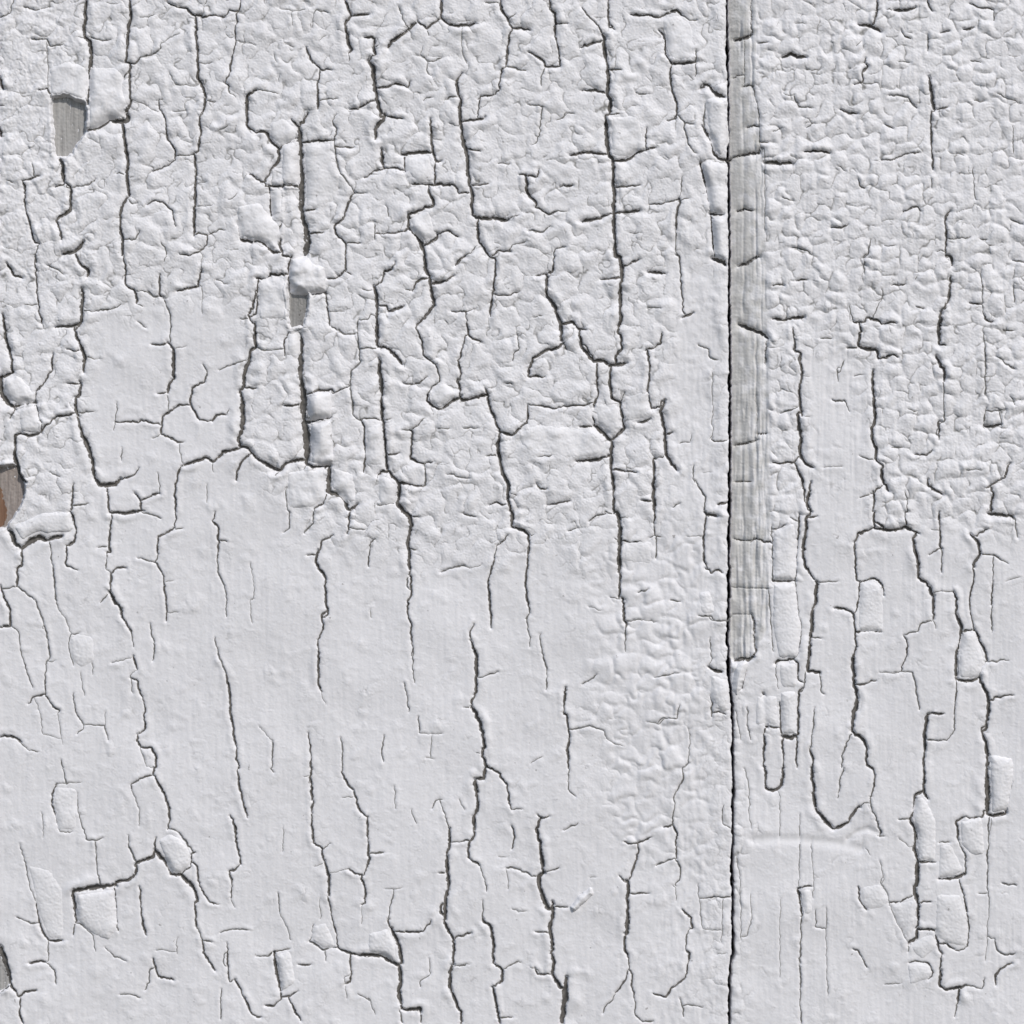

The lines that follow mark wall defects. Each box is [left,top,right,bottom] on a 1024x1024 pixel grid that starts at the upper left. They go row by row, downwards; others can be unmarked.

peeling [50,62,126,156]
crack [631,0,865,267]
crack [854,0,995,212]
crack [974,93,1021,154]
peeling [258,256,326,356]
peeling [728,0,801,735]
peeling [0,466,73,539]
crack [0,0,727,1024]
crack [698,211,1019,1023]
crack [603,705,752,1023]